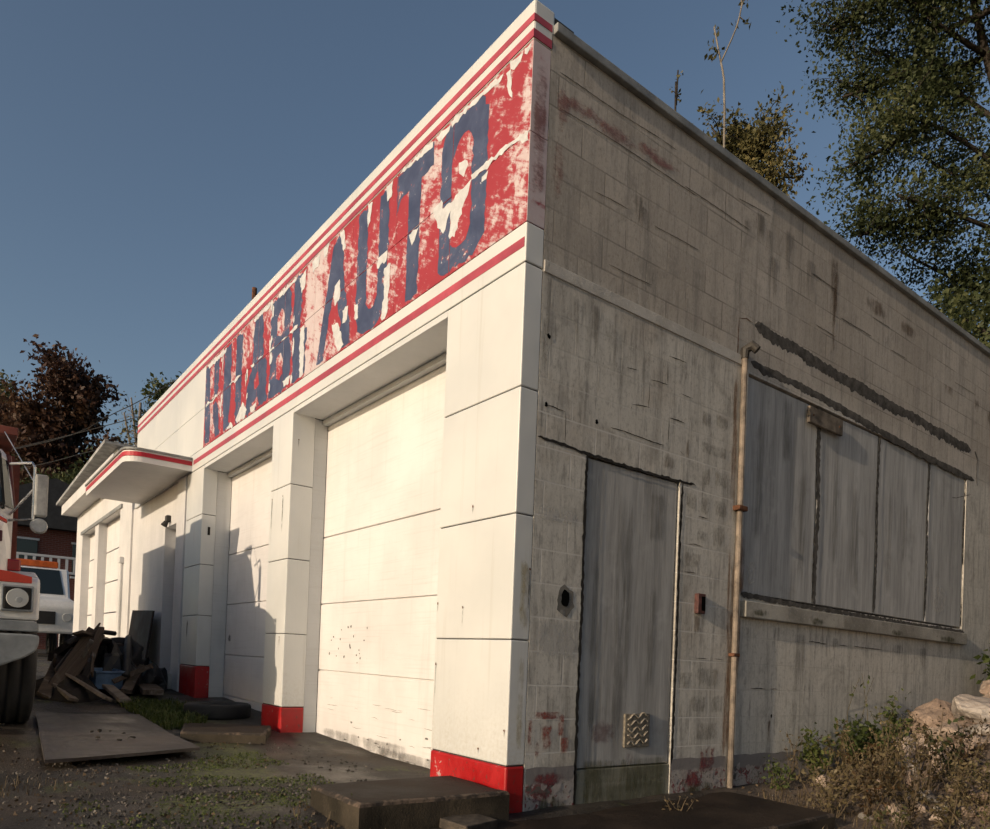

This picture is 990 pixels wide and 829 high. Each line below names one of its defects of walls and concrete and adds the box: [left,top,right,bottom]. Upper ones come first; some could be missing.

peeling [386,43,531,201]
peeling [433,130,529,239]
peeling [254,244,329,322]
peeling [332,279,358,351]
peeling [377,251,391,320]
peeling [206,318,305,430]
corrosion [722,546,744,752]